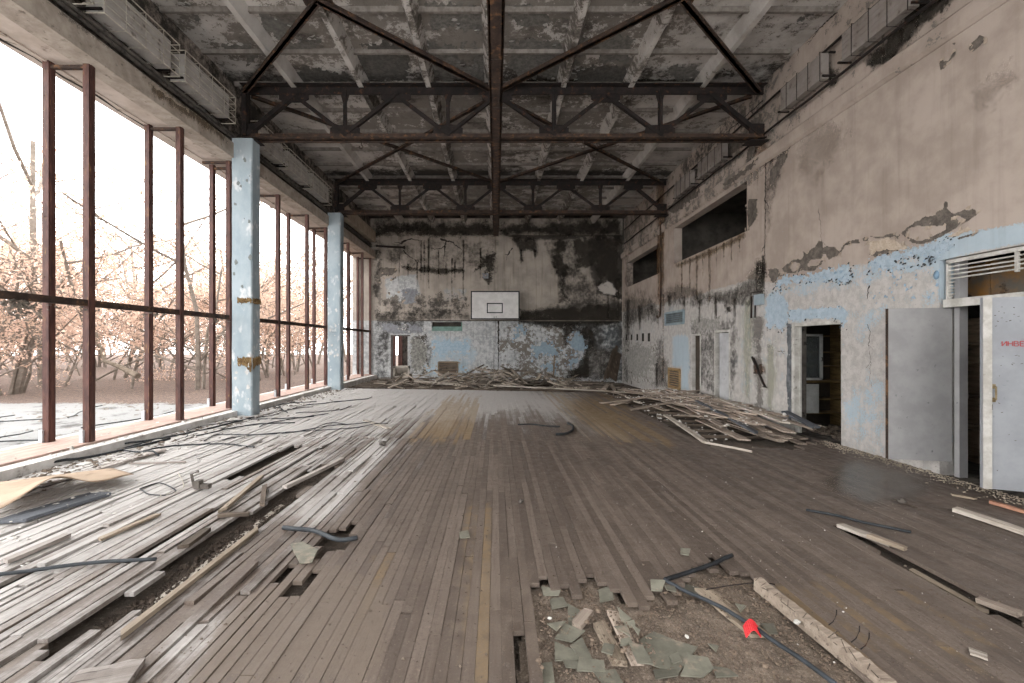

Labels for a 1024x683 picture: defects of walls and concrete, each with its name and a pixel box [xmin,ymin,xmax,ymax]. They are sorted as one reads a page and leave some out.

peeling [259,6,354,82]
peeling [357,39,414,82]
peeling [424,0,484,82]
peeling [506,3,636,82]
peeling [666,64,700,81]
water stain [868,0,951,66]
water stain [375,215,767,381]
peeling [765,202,981,420]